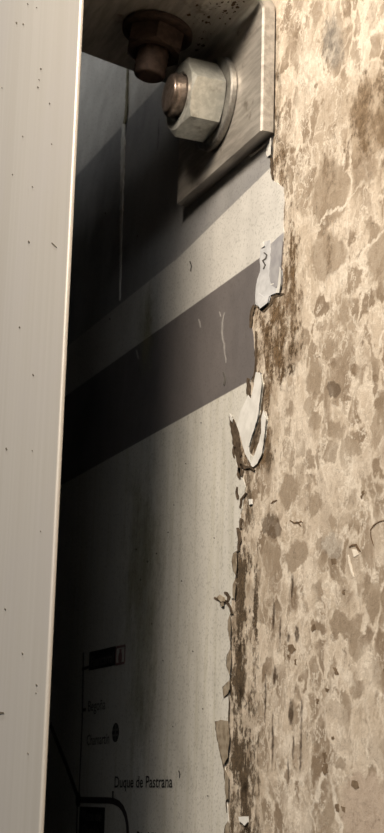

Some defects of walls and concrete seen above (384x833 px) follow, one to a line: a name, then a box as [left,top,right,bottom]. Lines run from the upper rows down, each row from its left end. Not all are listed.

peeling [230,233,284,467]
peeling [217,550,239,607]
peeling [215,613,231,833]